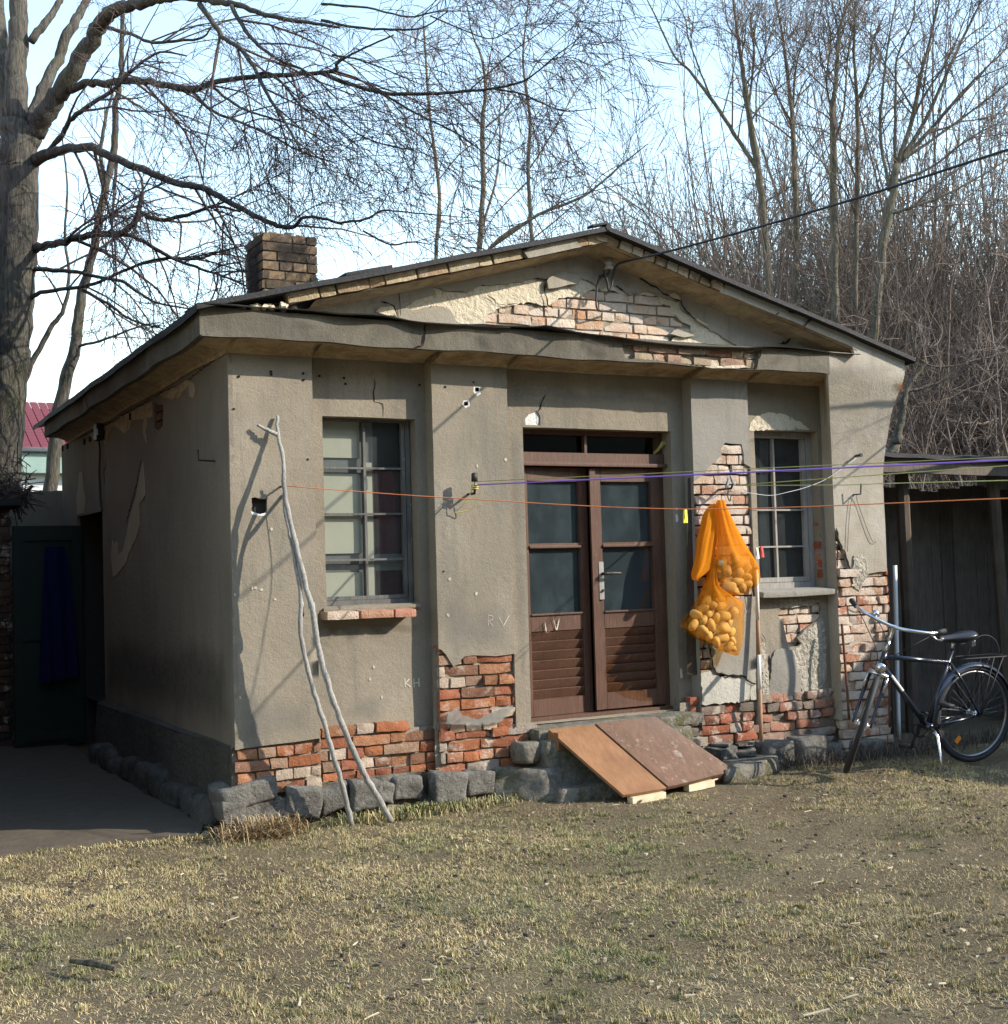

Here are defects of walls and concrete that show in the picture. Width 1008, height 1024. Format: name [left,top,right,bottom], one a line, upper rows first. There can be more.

flaking render [376,271,756,369]
crack [616,278,695,319]
flaking render [680,443,894,760]
flaking render [230,645,537,796]